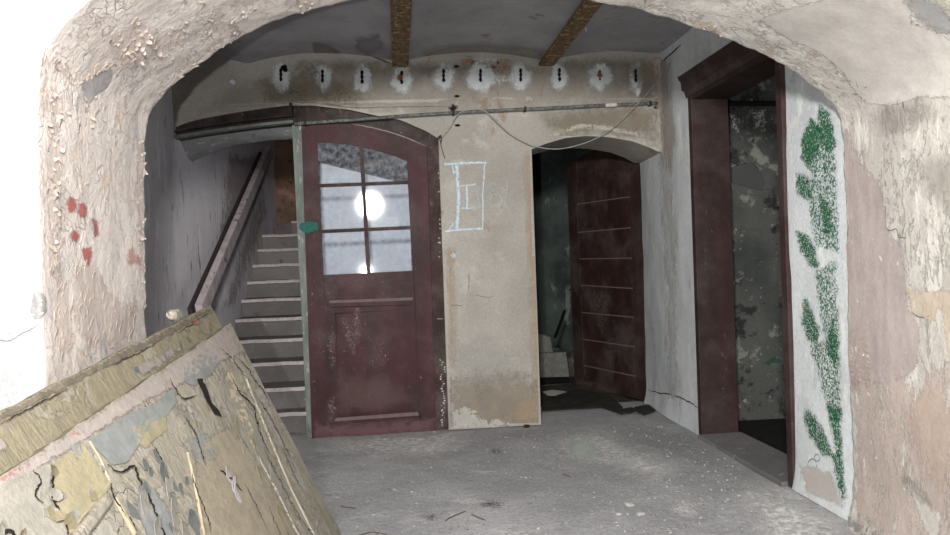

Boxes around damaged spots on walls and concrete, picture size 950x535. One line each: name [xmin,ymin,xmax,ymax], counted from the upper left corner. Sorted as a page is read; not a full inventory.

peeling [30,0,273,362]
leakage [451,375,538,426]
peeling [844,129,950,535]
flaking render [909,0,950,34]